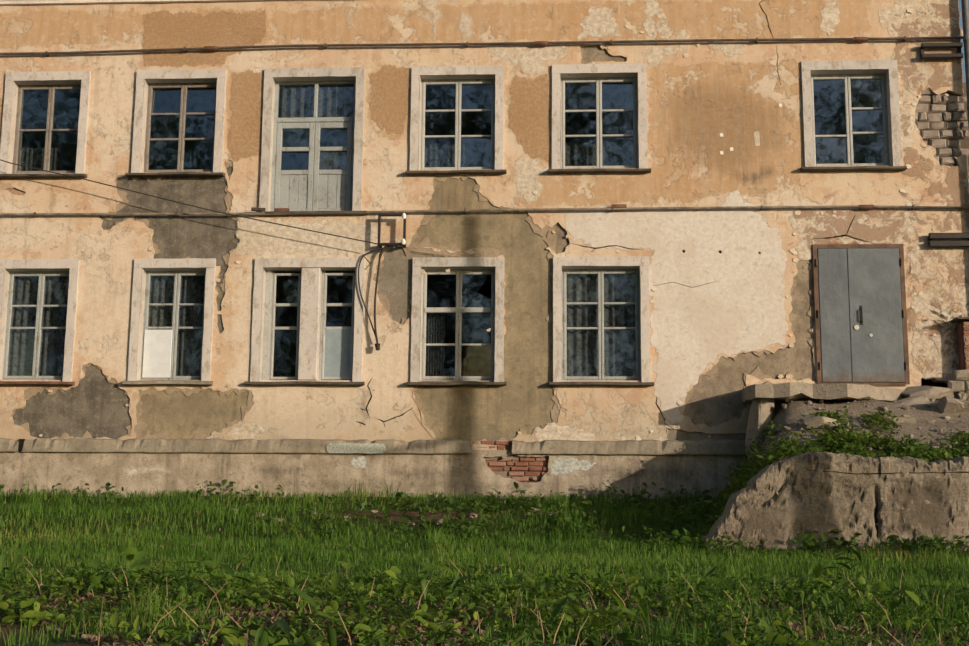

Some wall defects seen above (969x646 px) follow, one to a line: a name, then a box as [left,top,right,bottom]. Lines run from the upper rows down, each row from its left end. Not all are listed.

peeling [99,0,969,488]
flaking render [9,363,265,440]
crack [356,379,411,426]
crack [813,470,969,536]